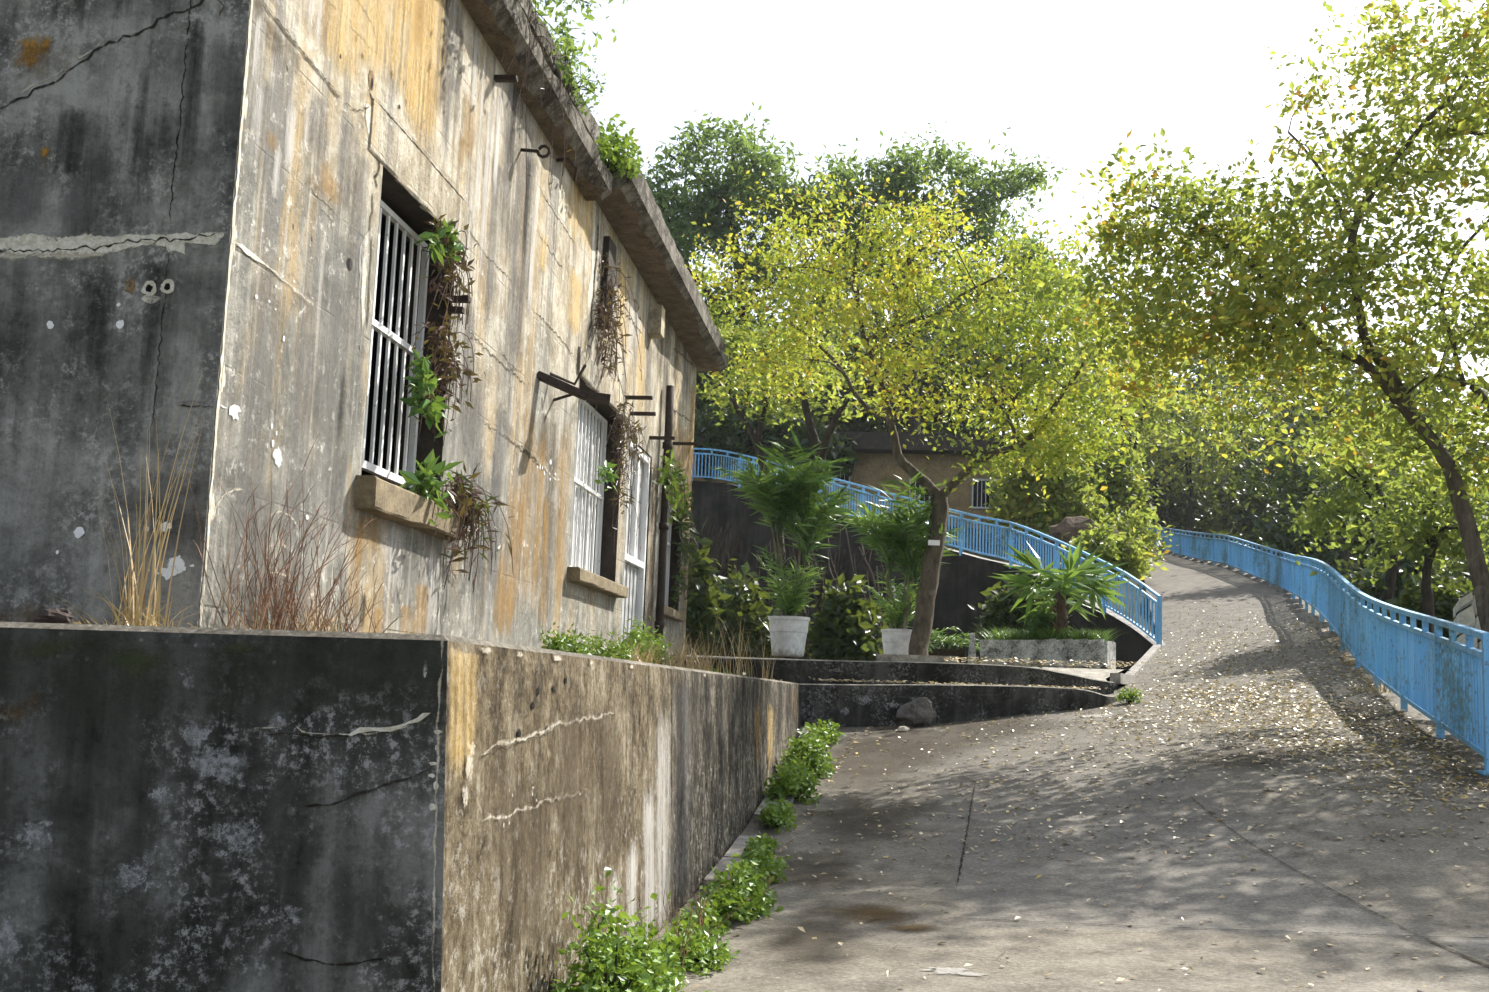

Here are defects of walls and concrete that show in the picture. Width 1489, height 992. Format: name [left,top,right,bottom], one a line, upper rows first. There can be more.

corrosion [18,36,51,66]
water stain [274,107,317,188]
crack [262,0,576,357]
water stain [437,0,537,357]
crack [0,0,311,430]
crack [483,421,560,481]
crack [264,713,430,738]
crack [480,711,613,759]
water stain [833,720,1035,777]
crack [485,787,583,827]
water stain [559,677,790,926]
water stain [783,906,934,956]